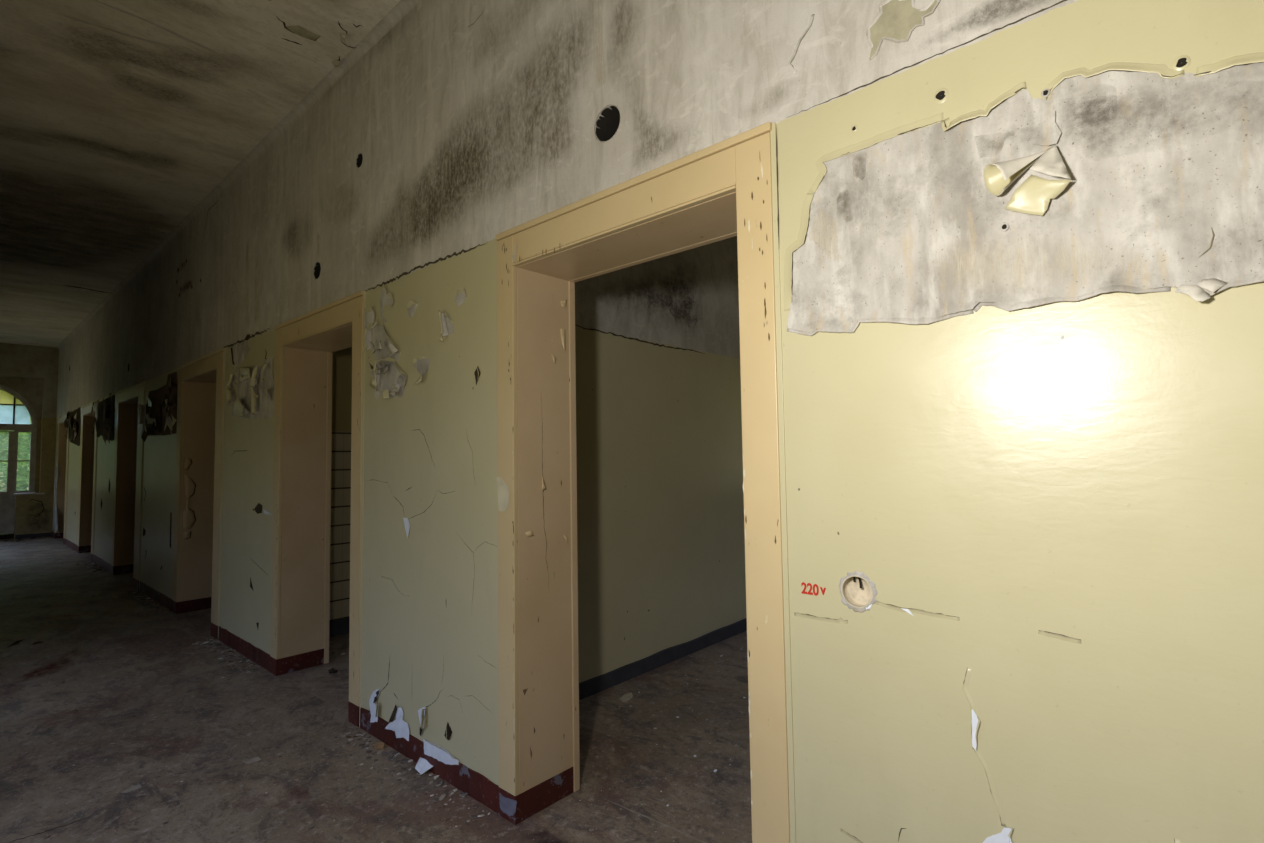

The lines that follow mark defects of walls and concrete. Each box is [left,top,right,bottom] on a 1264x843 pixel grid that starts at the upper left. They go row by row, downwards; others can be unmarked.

peeling [867,0,940,60]
peeling [784,52,1264,336]
peeling [139,371,178,442]
peeling [225,334,274,419]
peeling [364,286,407,400]
crack [368,429,475,538]
peeling [369,659,459,765]
crack [962,667,1013,843]